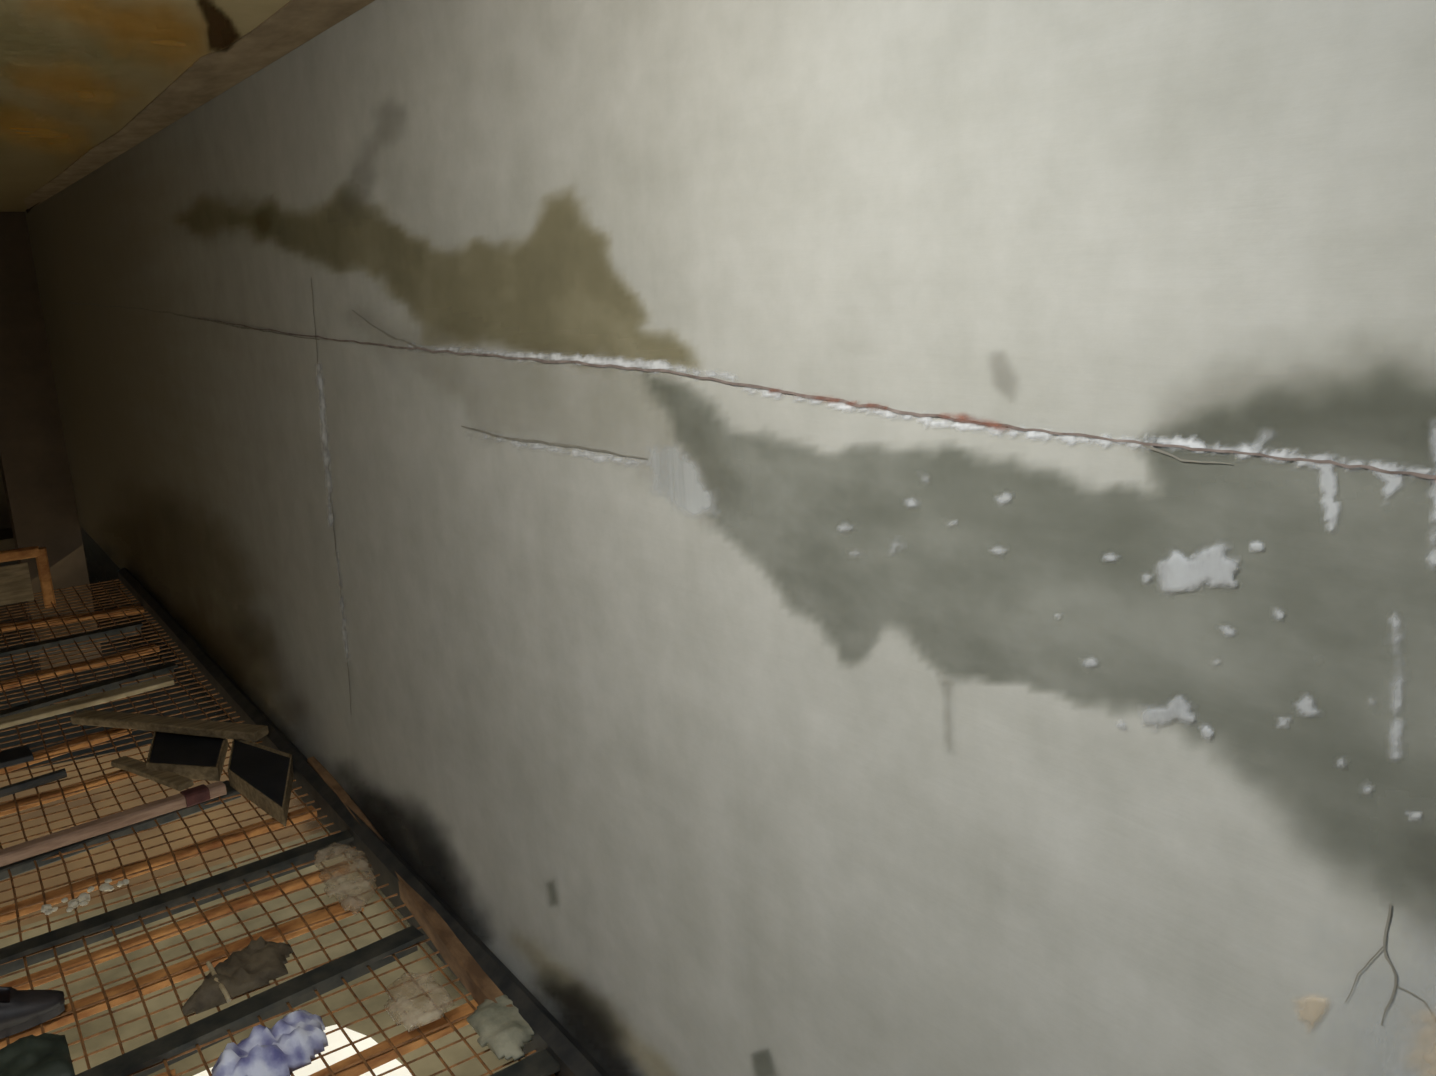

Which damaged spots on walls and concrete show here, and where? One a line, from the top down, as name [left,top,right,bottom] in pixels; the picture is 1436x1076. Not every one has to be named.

spalling [198,0,239,51]
crack [62,279,1436,710]
peeling [1145,547,1236,591]
peeling [1298,697,1316,714]
crack [1392,680,1401,757]